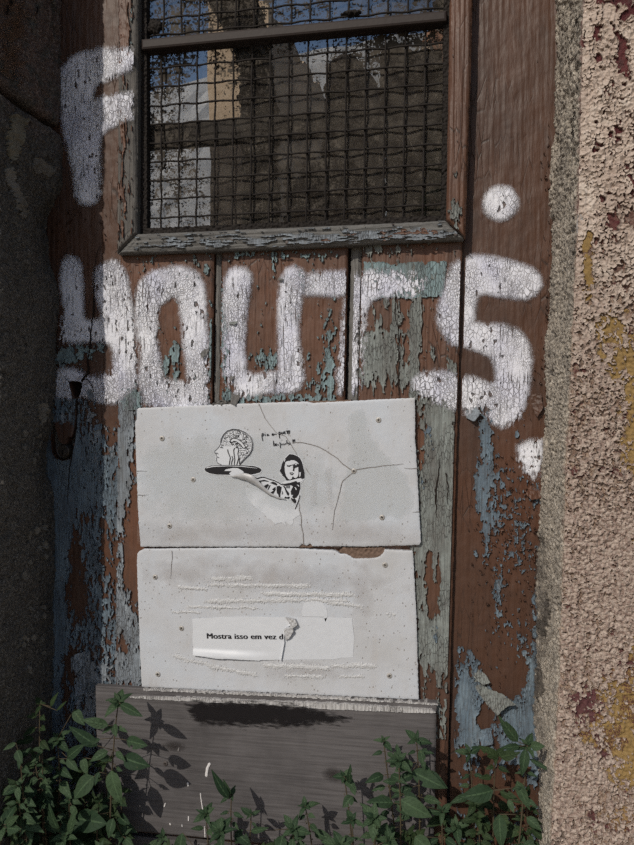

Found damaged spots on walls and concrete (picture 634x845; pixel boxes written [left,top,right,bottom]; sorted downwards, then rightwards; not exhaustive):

peeling [117,0,135,93]
peeling [32,104,541,818]
crack [258,403,416,528]
peeling [551,0,634,845]